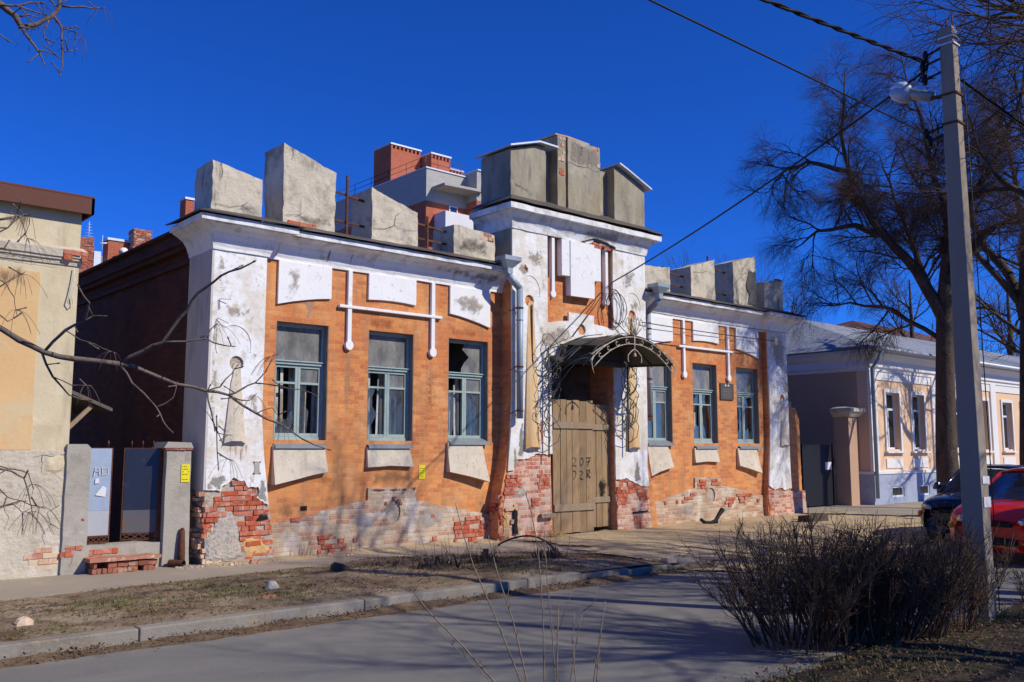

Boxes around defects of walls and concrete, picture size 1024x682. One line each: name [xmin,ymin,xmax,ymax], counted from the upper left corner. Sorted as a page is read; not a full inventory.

spalling [575,232,618,251]
spalling [452,423,552,542]
spalling [615,462,721,529]
spalling [722,485,795,516]
spalling [189,476,274,564]
spalling [23,545,118,571]
spalling [314,534,358,554]